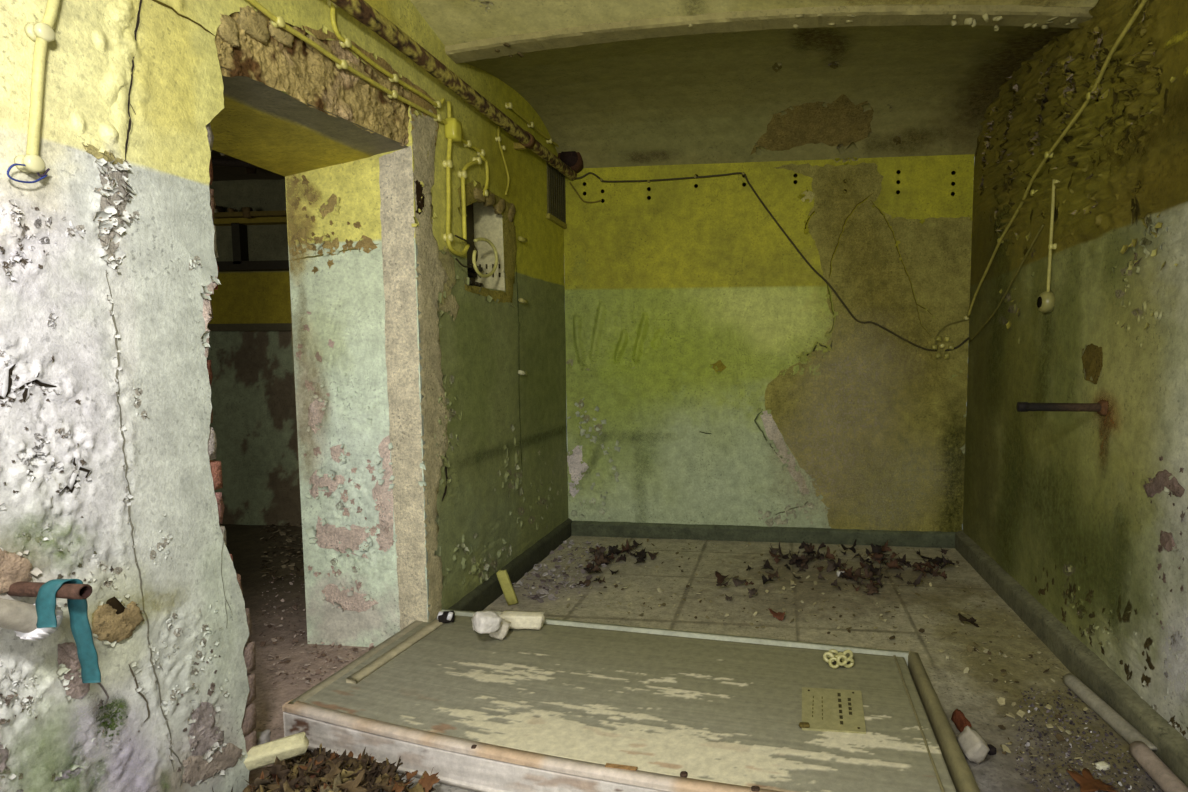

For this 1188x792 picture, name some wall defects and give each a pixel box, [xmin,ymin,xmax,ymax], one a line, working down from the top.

crack [125,0,215,160]
crack [0,364,60,407]
peeling [0,142,139,285]
peeling [290,25,517,630]
flaking render [750,0,1178,532]
peeling [0,513,73,594]
crack [58,458,92,495]
flaking render [56,551,144,647]
crack [97,271,184,786]
peeling [1035,455,1188,711]
peeling [1168,715,1188,737]